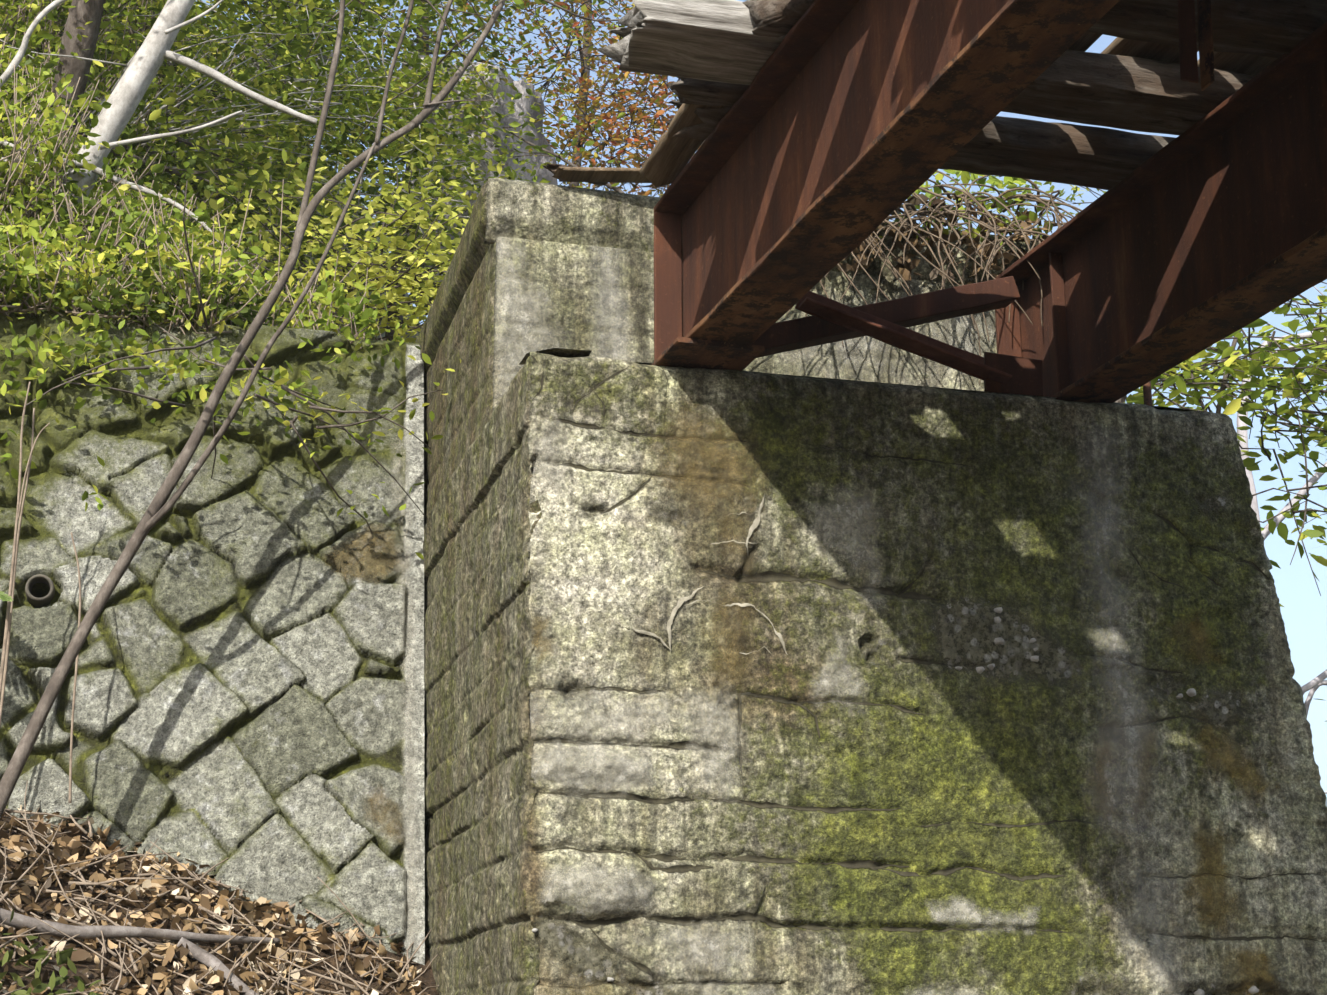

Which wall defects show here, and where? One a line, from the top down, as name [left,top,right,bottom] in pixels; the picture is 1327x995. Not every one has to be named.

crack [1124,512,1269,588]
crack [531,686,665,694]
crack [534,692,1113,828]
crack [899,657,987,668]
leakage [1104,611,1144,830]
crack [535,846,1072,989]